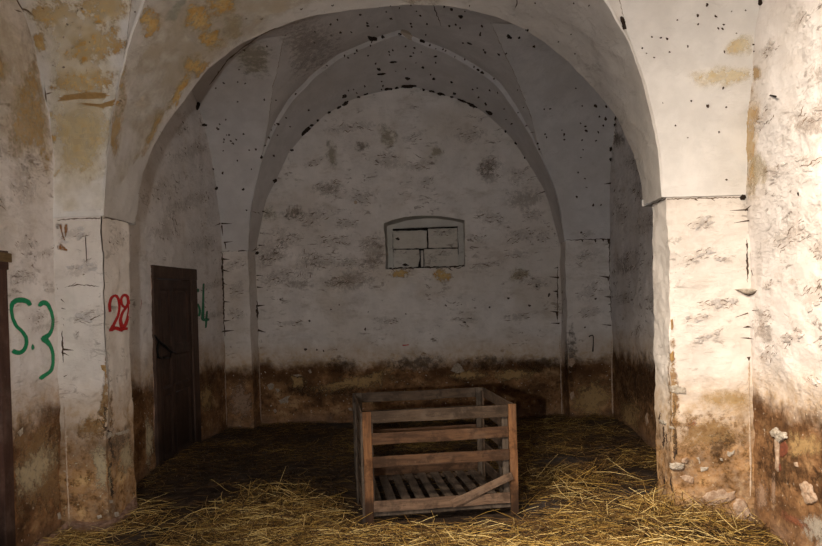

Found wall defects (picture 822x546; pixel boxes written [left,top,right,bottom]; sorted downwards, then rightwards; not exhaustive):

damp [12,0,127,170]
damp [281,357,442,396]
damp [450,357,556,381]
damp [14,409,60,515]
damp [91,429,134,488]
damp [145,417,154,463]
spalling [769,427,788,472]
spalling [703,489,753,521]
damp [756,431,822,546]
spalling [799,481,818,505]